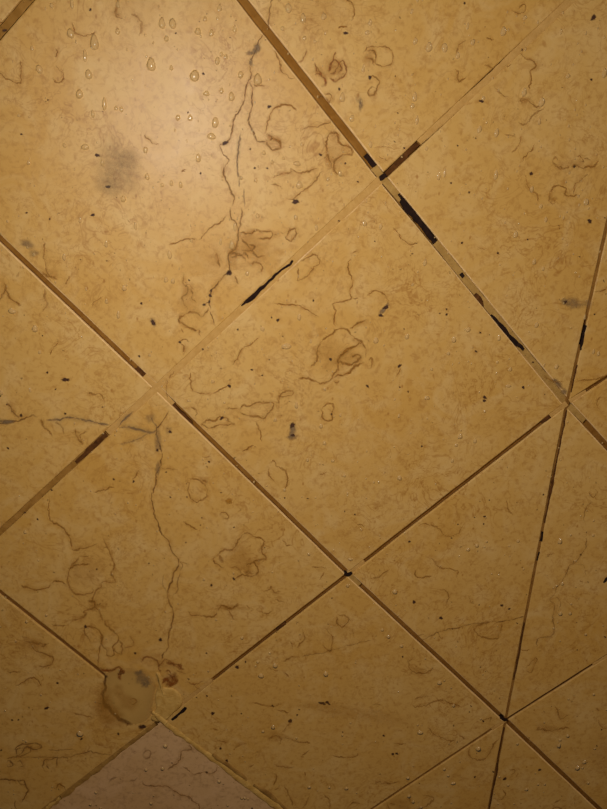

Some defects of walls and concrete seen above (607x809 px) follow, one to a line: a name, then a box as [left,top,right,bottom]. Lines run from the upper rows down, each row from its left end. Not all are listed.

crack [56,415,179,658]